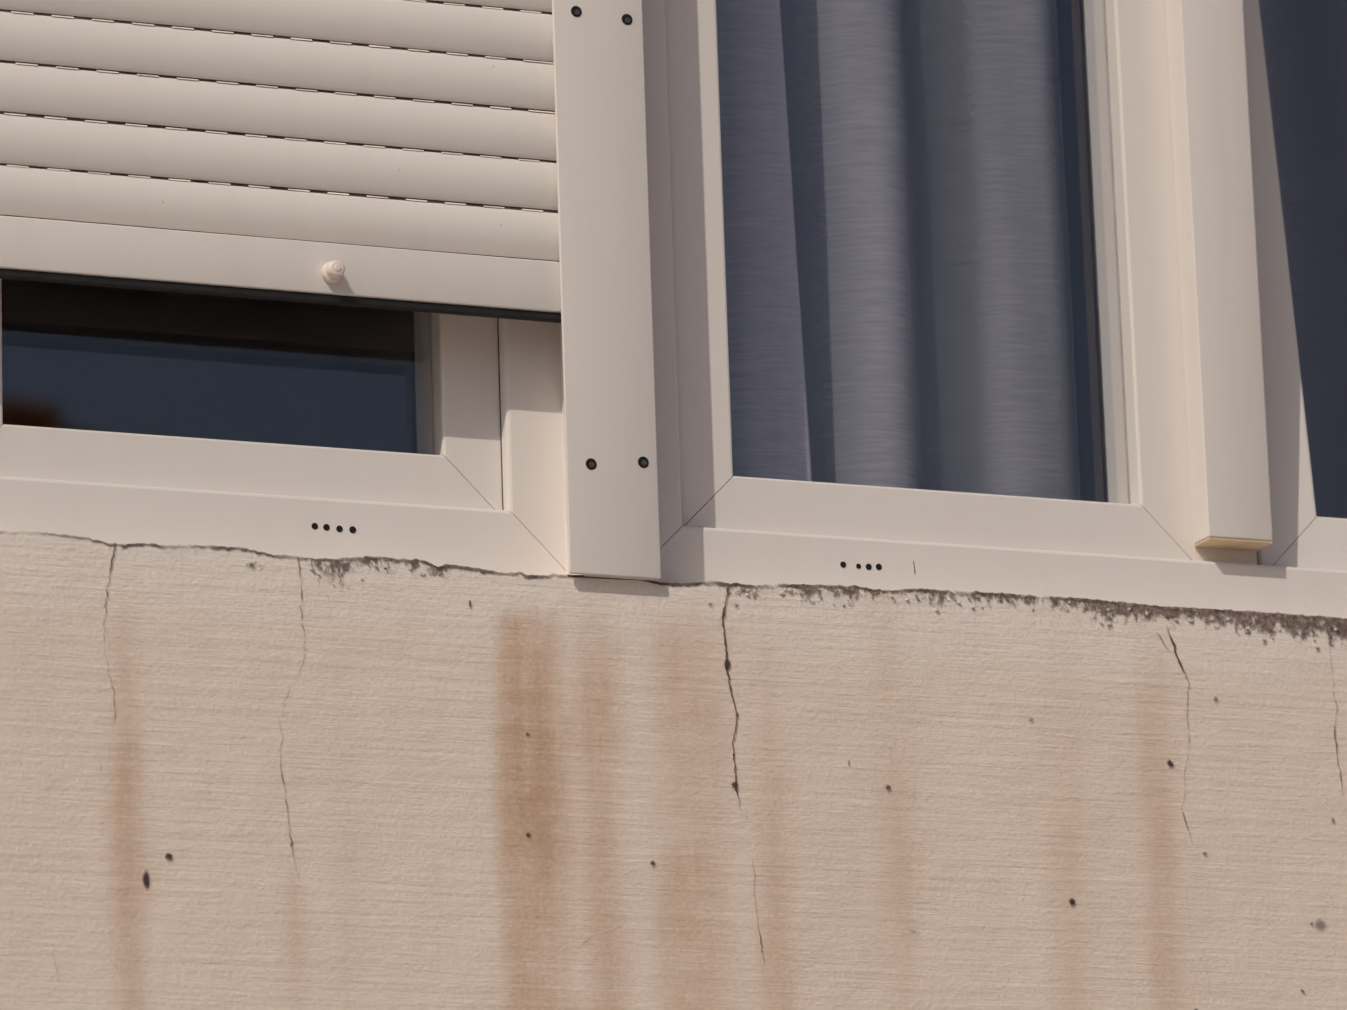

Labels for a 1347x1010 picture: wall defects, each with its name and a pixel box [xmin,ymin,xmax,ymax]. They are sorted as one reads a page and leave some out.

crack [45,532,162,611]
crack [196,545,1020,817]
crack [1067,597,1189,710]
crack [280,744,294,855]